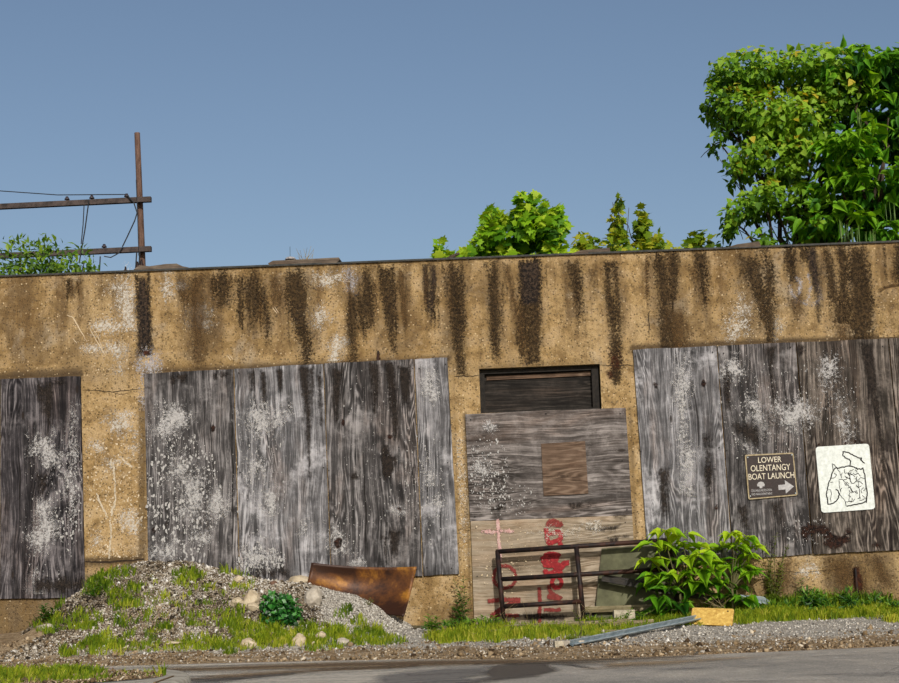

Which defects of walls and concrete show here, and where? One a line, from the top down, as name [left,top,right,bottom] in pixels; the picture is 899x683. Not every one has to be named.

water stain [135,273,153,357]
water stain [177,264,411,480]
water stain [422,261,468,376]
water stain [483,258,543,364]
water stain [565,261,624,387]
water stain [644,250,711,348]
water stain [722,370,731,409]
water stain [732,244,899,477]